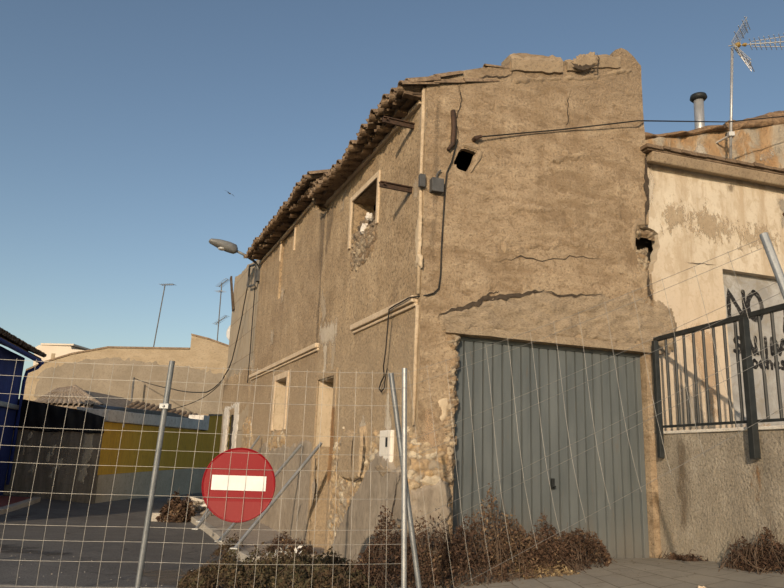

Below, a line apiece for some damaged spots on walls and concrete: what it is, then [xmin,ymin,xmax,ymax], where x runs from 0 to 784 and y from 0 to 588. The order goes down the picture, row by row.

hole [463,143,482,173]
crack [495,254,601,262]
spalling [630,201,778,292]
crack [438,290,600,317]
flaking render [327,394,392,547]